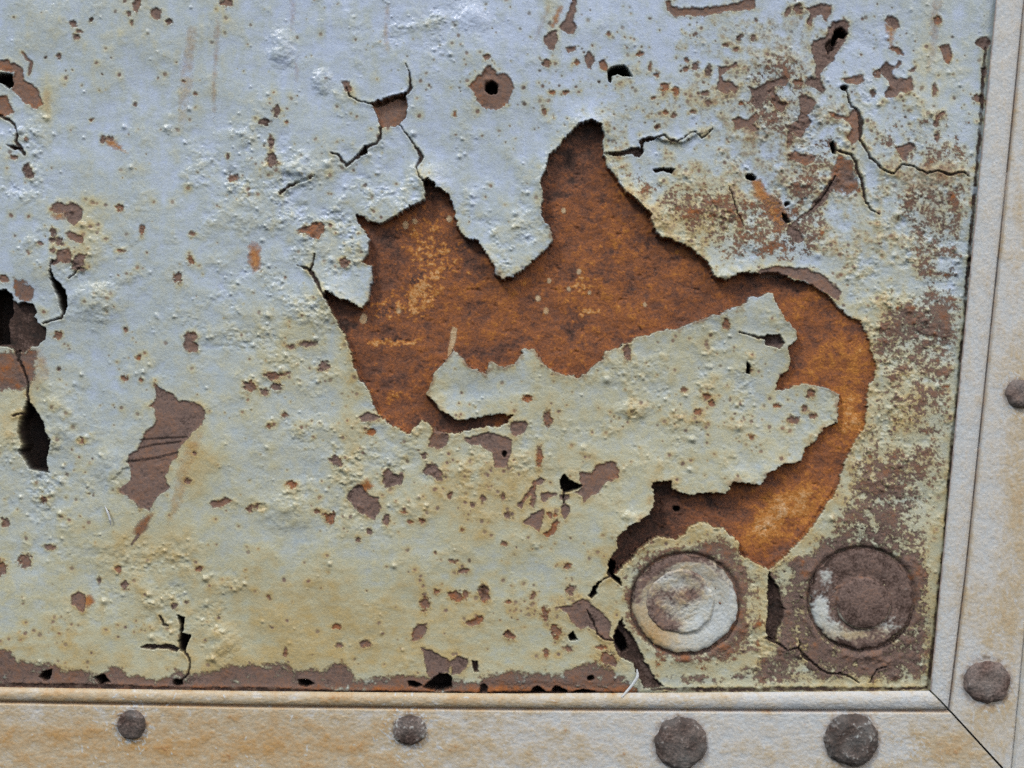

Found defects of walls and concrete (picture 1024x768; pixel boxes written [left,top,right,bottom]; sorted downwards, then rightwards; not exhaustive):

crack [331,81,427,185]
crack [404,65,412,97]
crack [606,128,713,174]
rust [621,19,850,300]
peeling [119,383,205,545]
rust [242,372,290,396]
rust [543,410,553,428]
peeling [324,120,877,574]
rust [623,115,969,686]
crack [651,47,987,692]
rust [314,509,335,525]
crack [4,652,621,694]